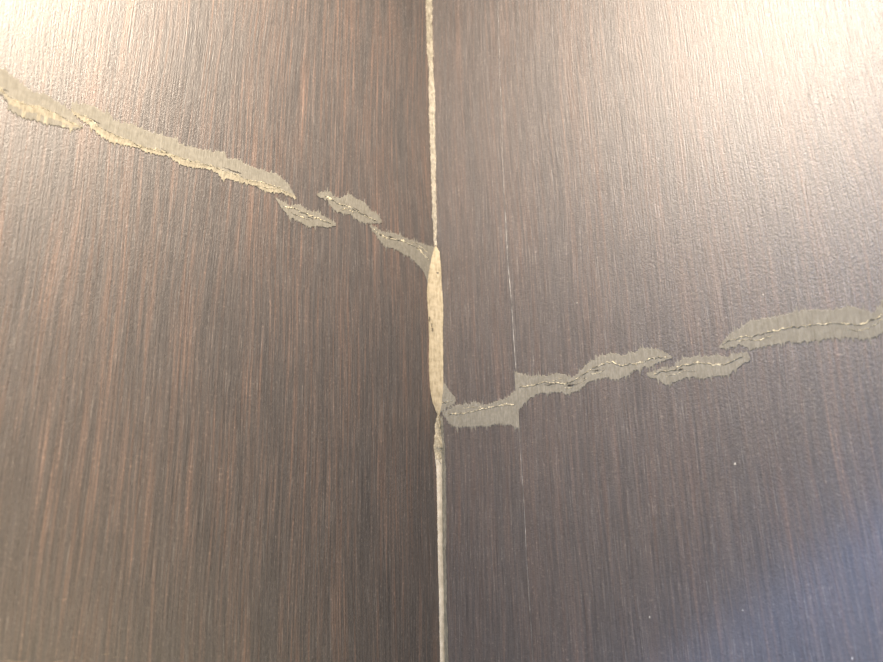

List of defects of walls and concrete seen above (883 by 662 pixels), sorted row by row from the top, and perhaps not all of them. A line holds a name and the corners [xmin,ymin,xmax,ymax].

crack [0,65,434,283]